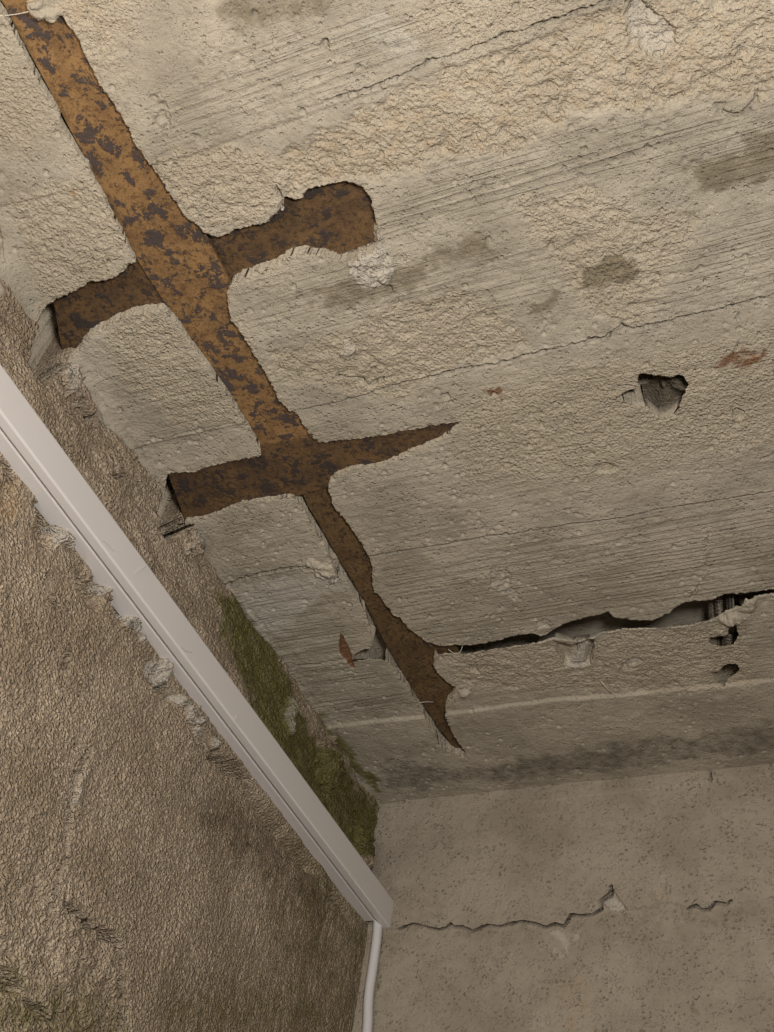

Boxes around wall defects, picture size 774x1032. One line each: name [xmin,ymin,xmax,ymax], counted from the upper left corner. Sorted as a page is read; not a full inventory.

crack [320,0,621,105]
spalling [0,0,467,757]
crack [290,293,774,412]
crack [368,490,774,558]
damp [223,568,353,650]
rust [338,633,382,669]
crack [427,588,774,668]
crack [397,884,774,934]